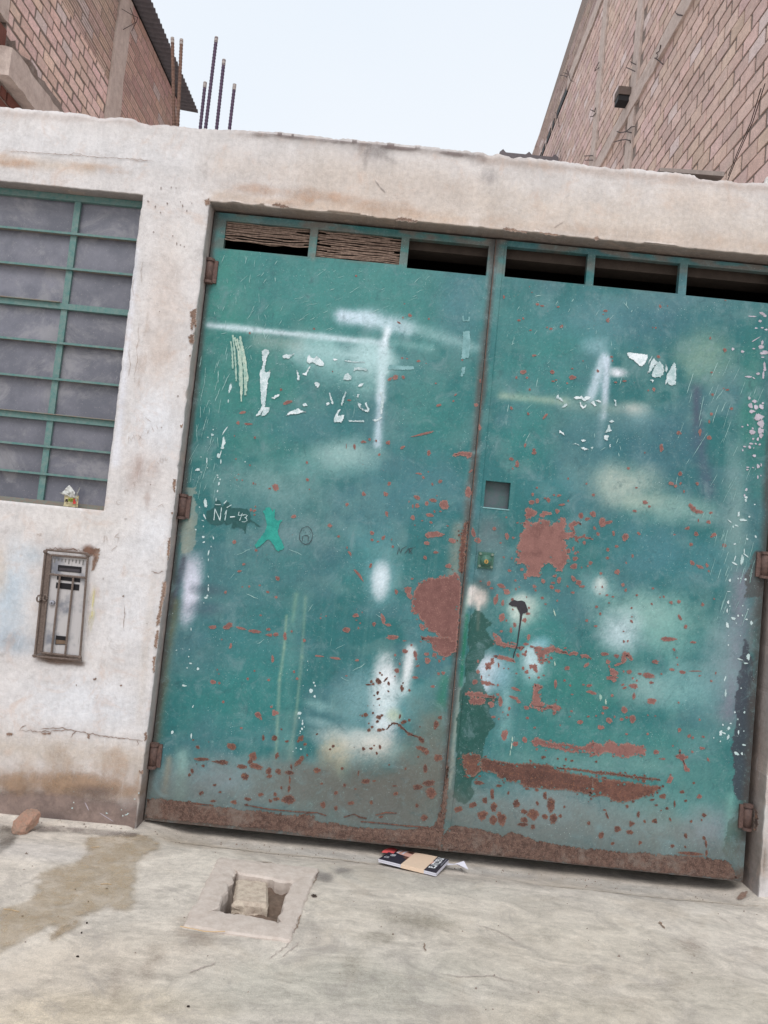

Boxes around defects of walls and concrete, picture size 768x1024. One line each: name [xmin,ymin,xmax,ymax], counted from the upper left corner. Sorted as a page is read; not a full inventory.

peeling [723,312,768,379]
peeling [741,397,764,479]
corrosion [493,493,629,594]
corrosion [404,521,469,675]
crack [19,726,141,744]
corrosion [145,616,738,880]
water stain [0,775,158,914]